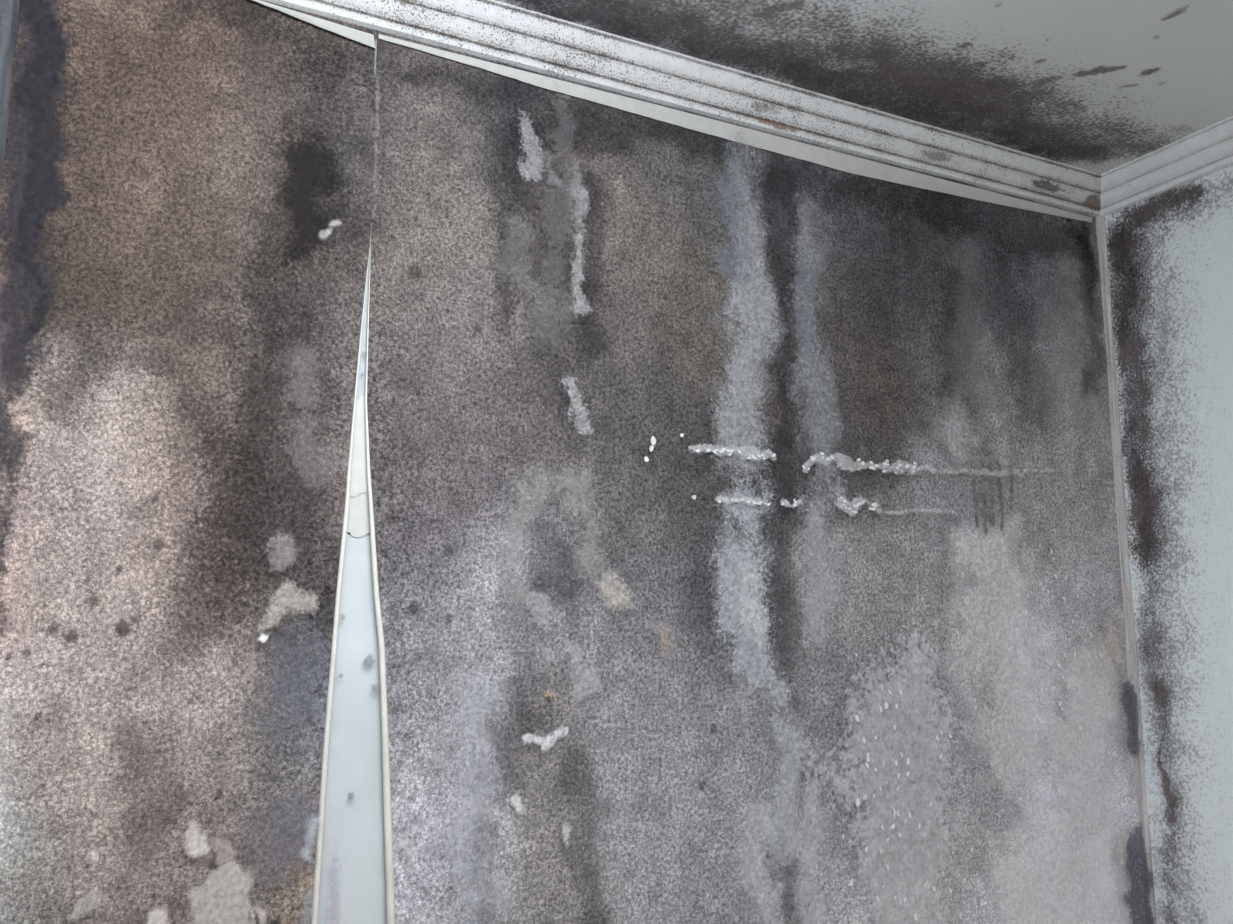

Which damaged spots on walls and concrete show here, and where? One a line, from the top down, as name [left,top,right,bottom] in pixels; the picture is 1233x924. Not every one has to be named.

water stain [279,141,343,258]
water stain [0,0,68,494]
water stain [503,93,1208,924]
water stain [0,519,9,570]
water stain [268,535,295,568]
water stain [48,623,78,641]
water stain [117,617,140,635]
water stain [259,583,317,642]